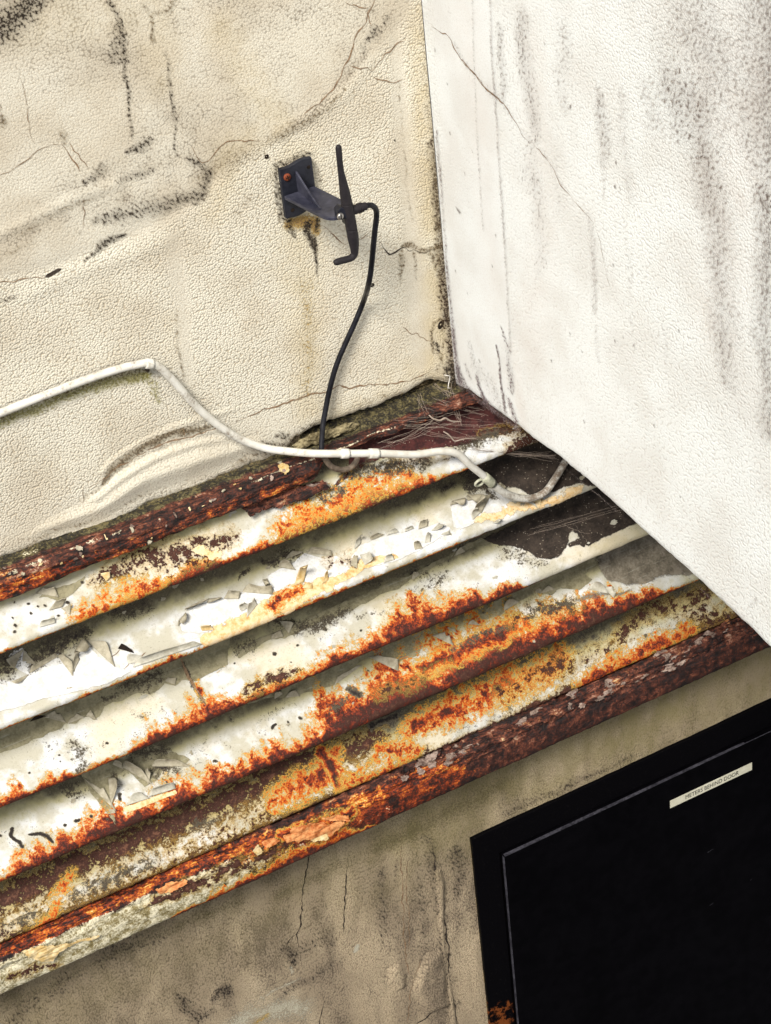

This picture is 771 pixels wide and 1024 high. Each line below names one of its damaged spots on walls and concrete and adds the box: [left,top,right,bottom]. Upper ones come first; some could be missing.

crack [0,268,62,283]
leakage [84,52,216,261]
crack [303,3,405,116]
leakage [398,120,519,460]
crack [431,26,615,298]
leakage [86,425,213,496]
rust [0,402,537,654]
rust [1,484,584,730]
peeling [0,441,693,753]
spalling [0,827,54,848]
peeling [63,744,193,827]
rust [0,578,738,943]